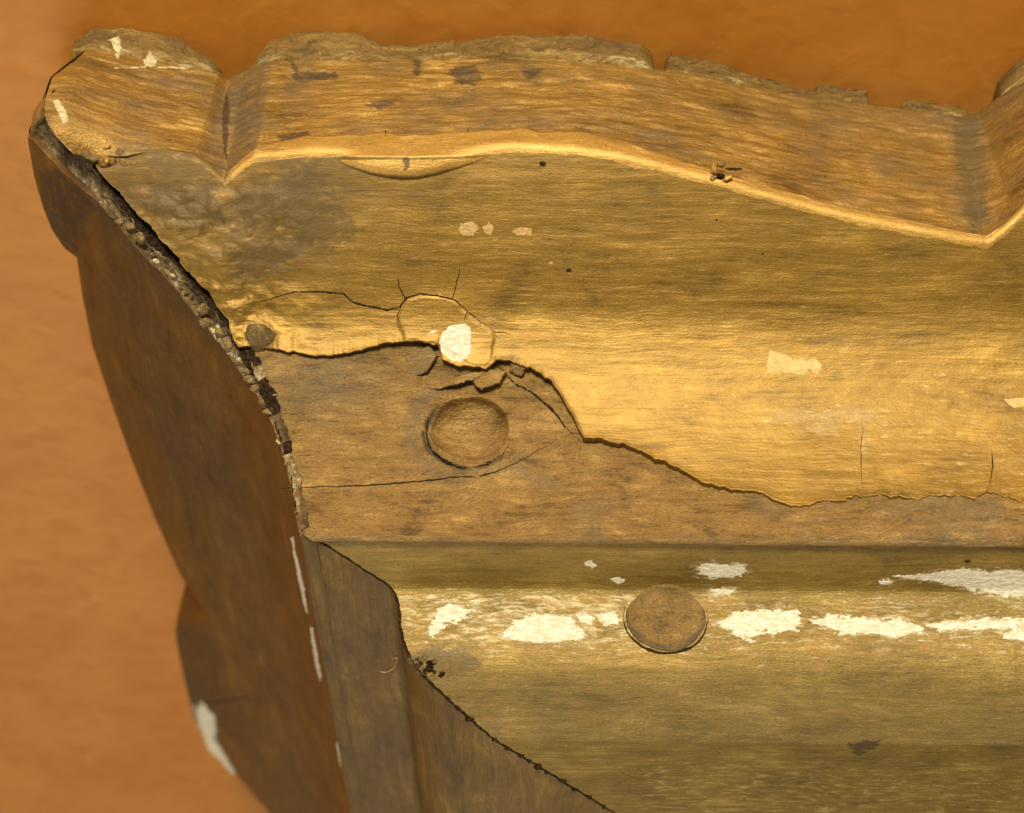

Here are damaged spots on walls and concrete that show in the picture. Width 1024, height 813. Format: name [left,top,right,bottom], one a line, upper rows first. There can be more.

spalling [81,145,137,167]
crack [35,89,615,813]
peeling [251,324,1024,680]